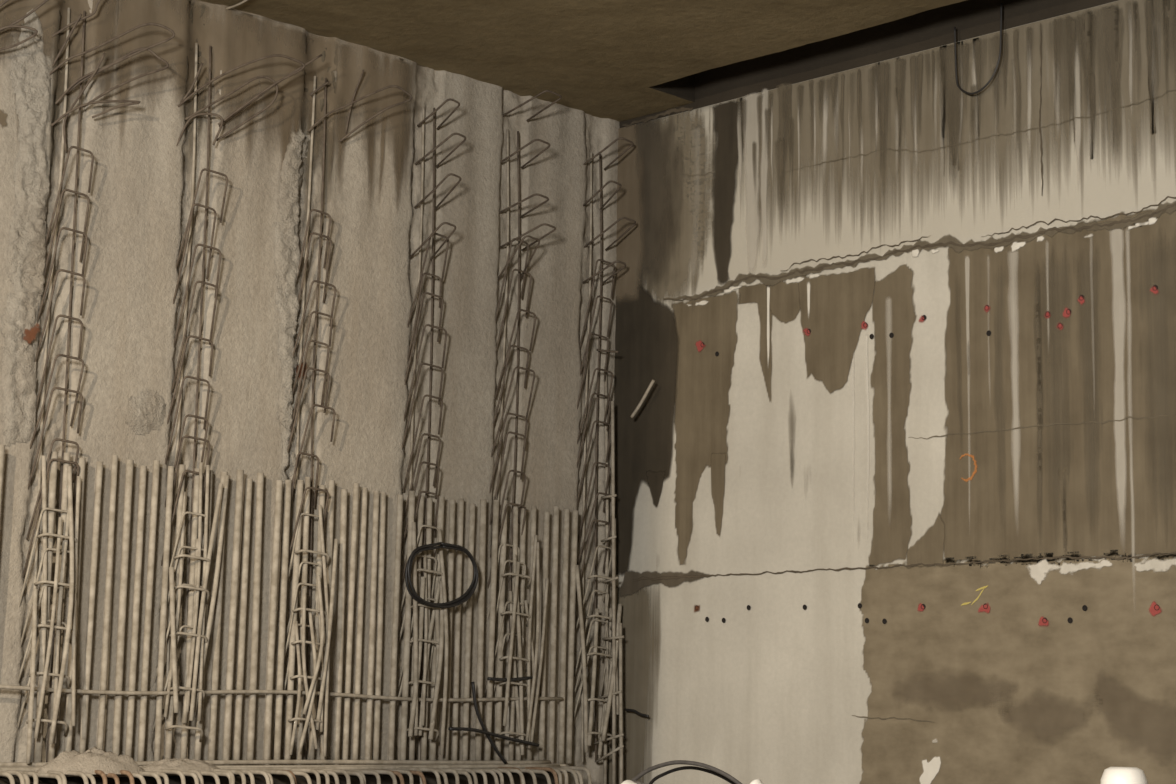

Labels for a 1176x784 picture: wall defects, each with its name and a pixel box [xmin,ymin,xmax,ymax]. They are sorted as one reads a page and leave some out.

spalling [0,9,54,519]
spalling [0,129,578,767]
spalling [593,367,624,784]
damp [608,0,1176,784]
crack [620,552,1176,597]
crack [663,196,1176,301]